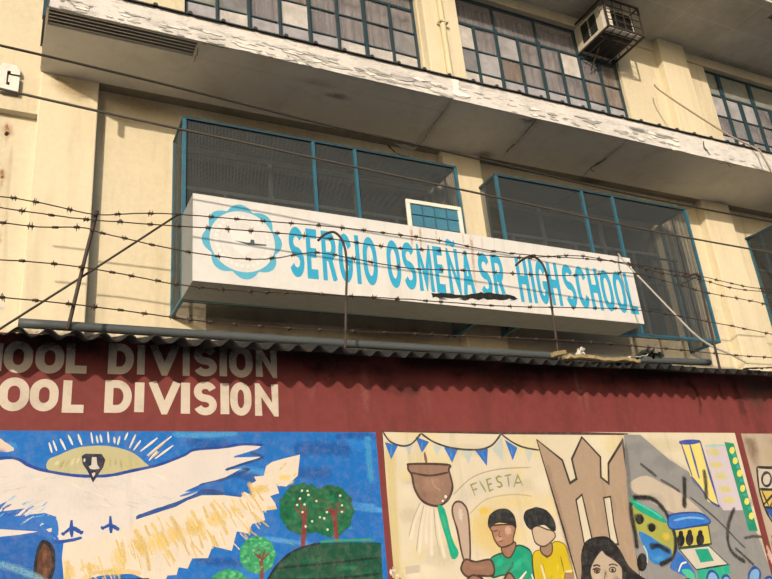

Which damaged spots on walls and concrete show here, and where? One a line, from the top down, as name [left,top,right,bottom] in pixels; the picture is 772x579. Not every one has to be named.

peeling [58,0,94,13]
peeling [106,10,602,130]
crack [502,118,544,158]
peeling [614,126,687,152]
crack [579,140,628,184]